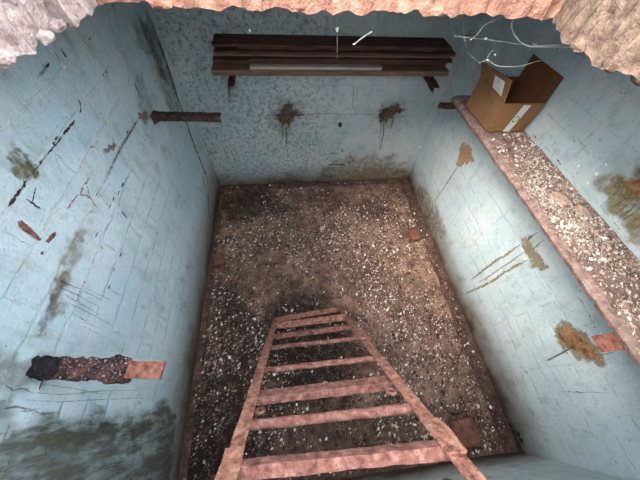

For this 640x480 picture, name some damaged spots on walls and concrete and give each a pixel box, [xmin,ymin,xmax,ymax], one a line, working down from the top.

crack [8,99,82,209]
corrosion [276,101,304,146]
corrosion [379,103,405,149]
corrosion [437,142,474,198]
peeling [18,219,56,243]
corrosion [468,233,548,293]
damp [0,387,176,480]